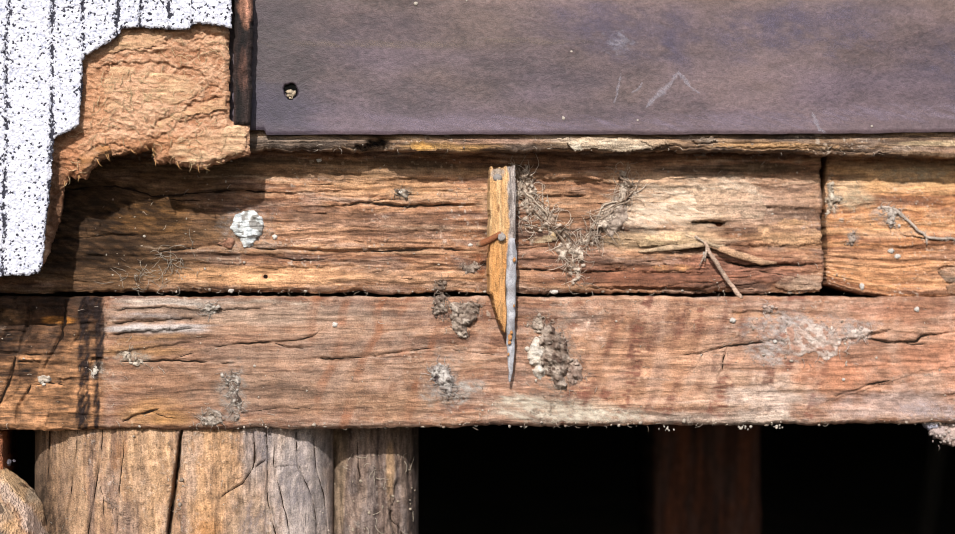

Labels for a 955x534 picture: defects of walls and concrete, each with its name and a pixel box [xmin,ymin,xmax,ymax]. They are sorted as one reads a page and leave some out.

spalling [41,24,251,269]
crack [0,299,71,405]
crack [684,341,779,379]
crack [867,331,937,345]
crack [221,407,328,534]